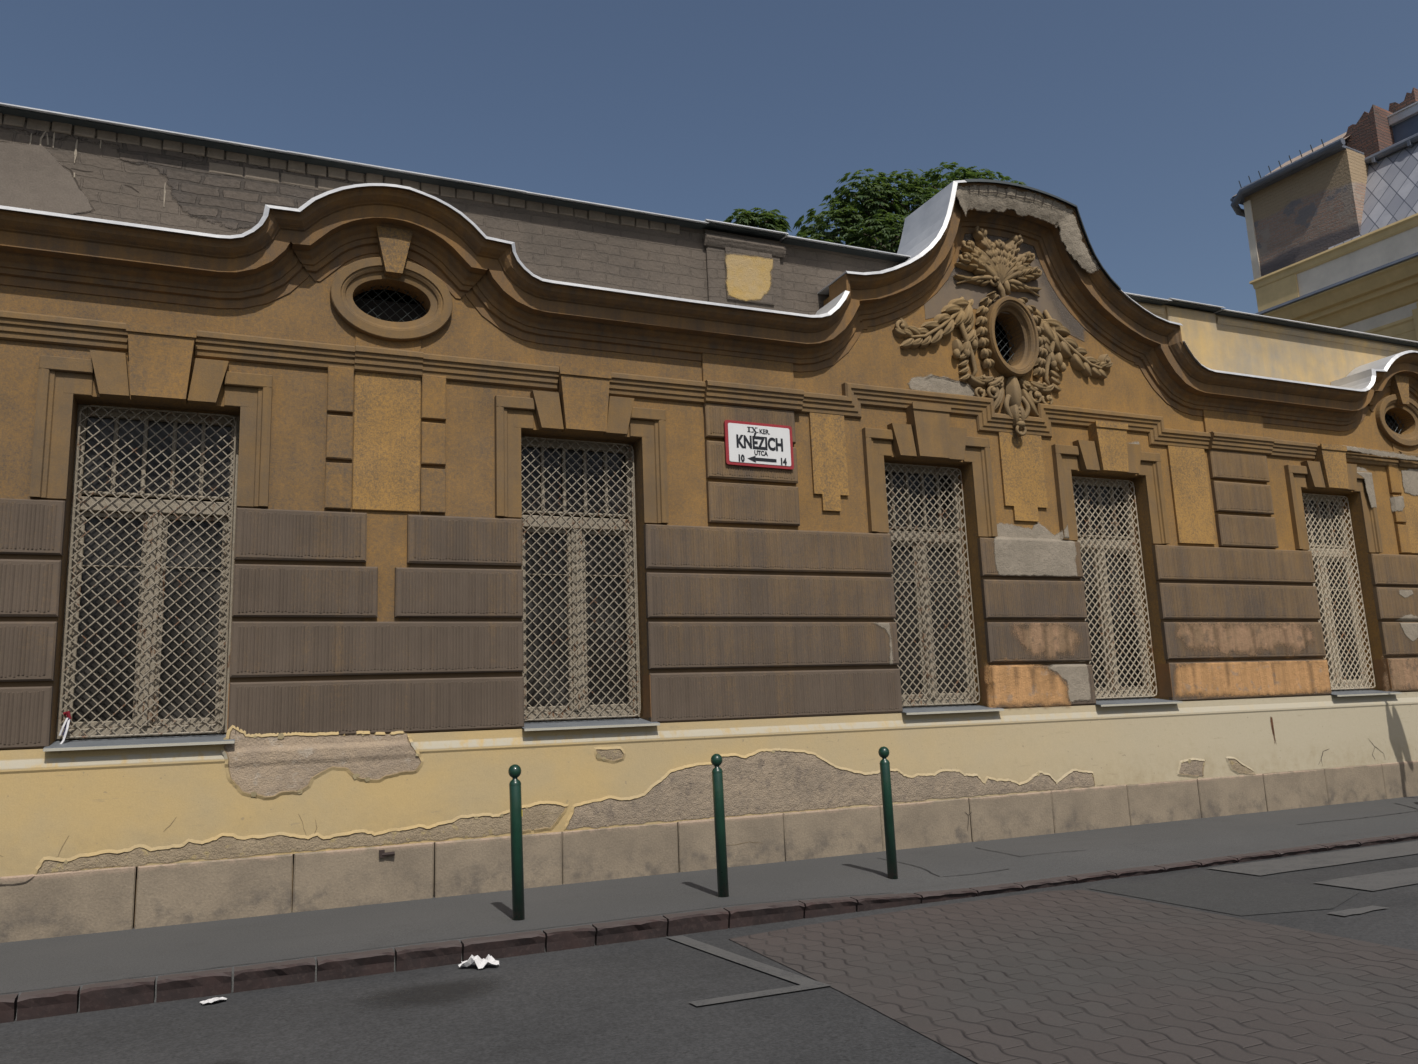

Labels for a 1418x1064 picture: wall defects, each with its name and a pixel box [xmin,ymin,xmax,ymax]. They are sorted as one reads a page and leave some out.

flaking render [0,114,349,229]
peeling [986,623,1079,707]
peeling [1175,623,1331,697]
spalling [220,725,424,800]
spalling [34,746,1096,875]